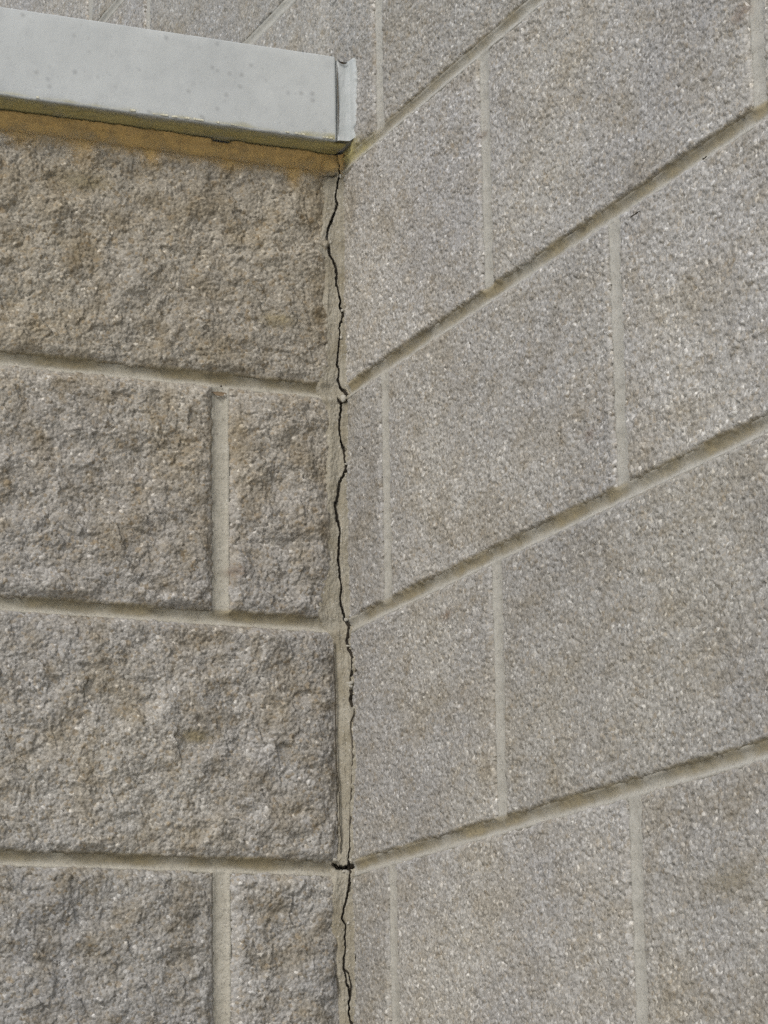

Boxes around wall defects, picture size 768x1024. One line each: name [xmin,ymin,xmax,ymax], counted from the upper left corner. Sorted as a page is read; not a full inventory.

crack [323,154,355,1024]